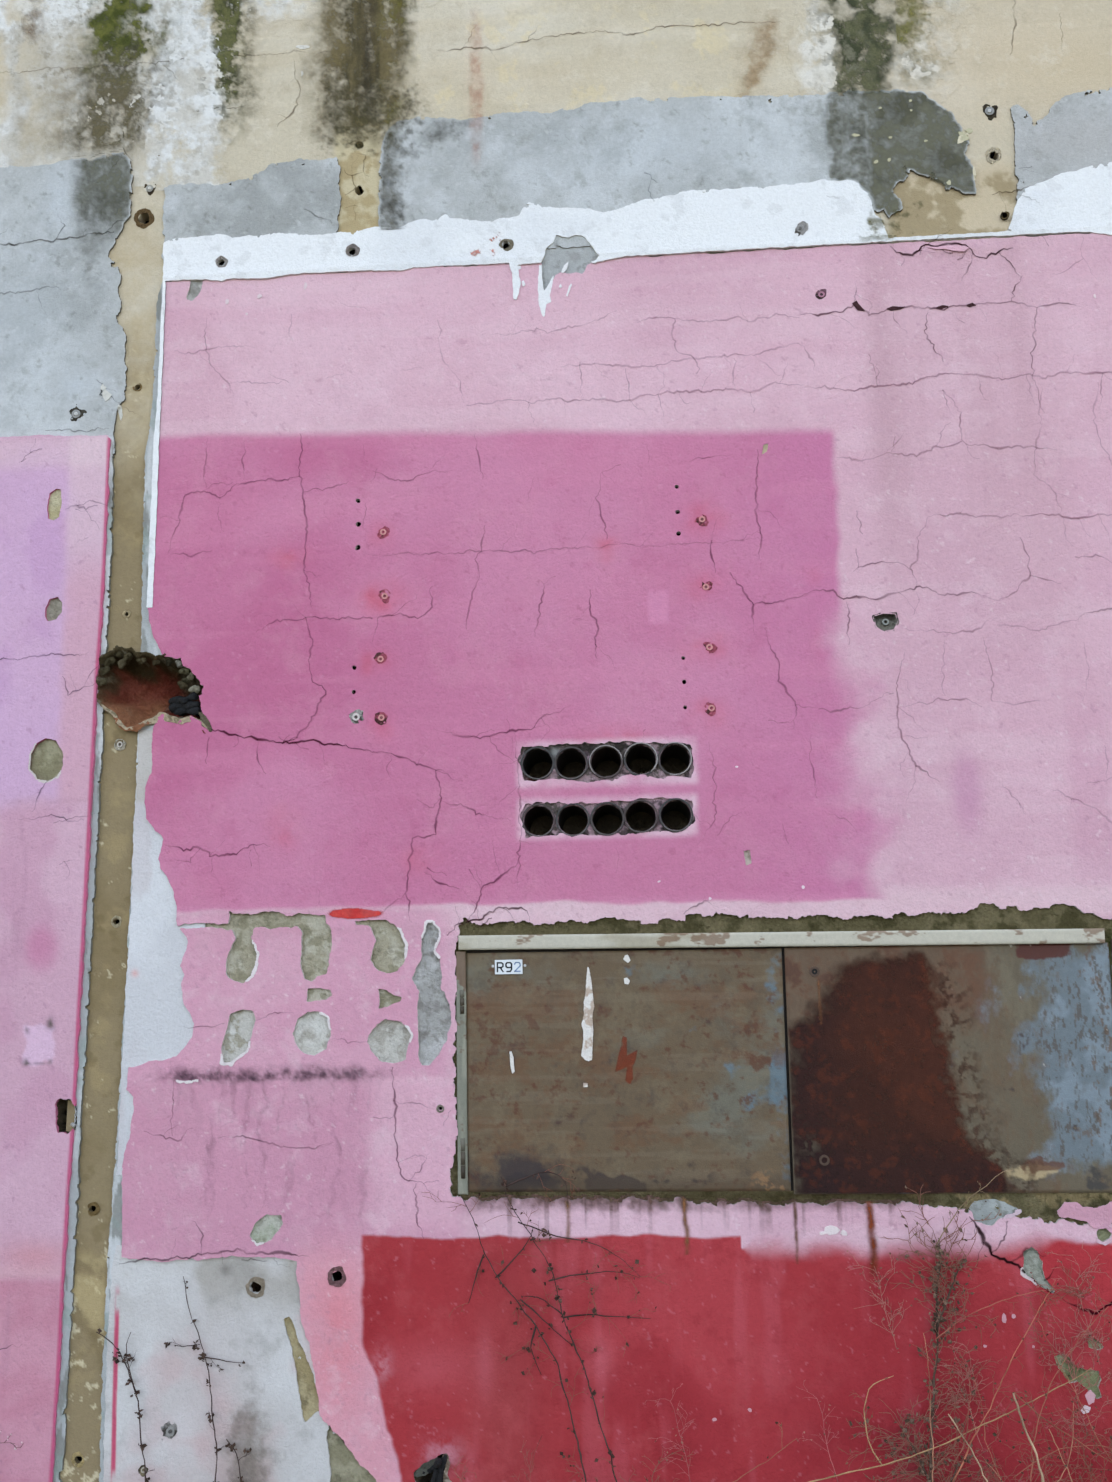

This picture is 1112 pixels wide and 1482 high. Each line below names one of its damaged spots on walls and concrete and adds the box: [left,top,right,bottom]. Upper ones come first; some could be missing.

damp [0,0,411,230]
flaking render [204,0,1112,256]
damp [787,0,980,238]
flaking render [109,162,166,311]
spalling [187,281,203,301]
peeling [518,246,598,317]
crack [838,561,928,600]
peeling [96,645,332,1175]
rust [788,953,1015,1269]
crack [969,1216,1112,1315]
spalling [1054,1354,1101,1414]